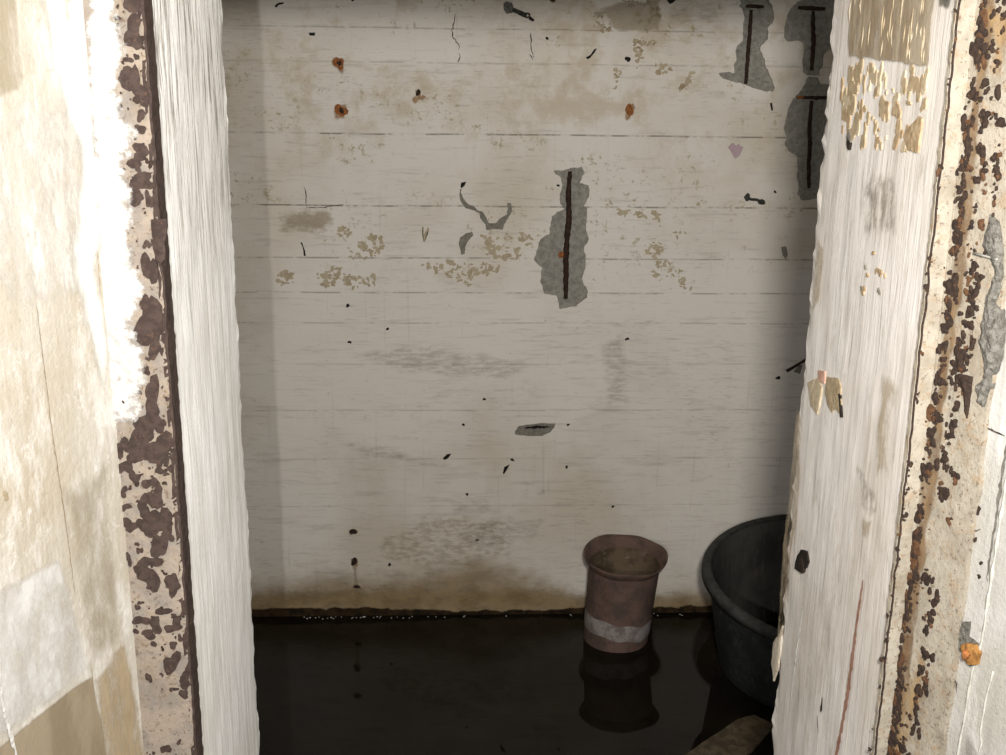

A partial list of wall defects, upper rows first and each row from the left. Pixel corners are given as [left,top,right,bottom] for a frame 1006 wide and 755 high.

corrosion [332,57,344,72]
corrosion [334,104,348,118]
corrosion [625,103,634,120]
spalling [719,0,835,200]
peeling [840,0,934,153]
spalling [421,167,590,309]
spalling [973,214,1006,407]
corrosion [884,0,1006,755]
spalling [515,423,555,436]
water stain [251,570,586,617]
water stain [652,598,713,613]